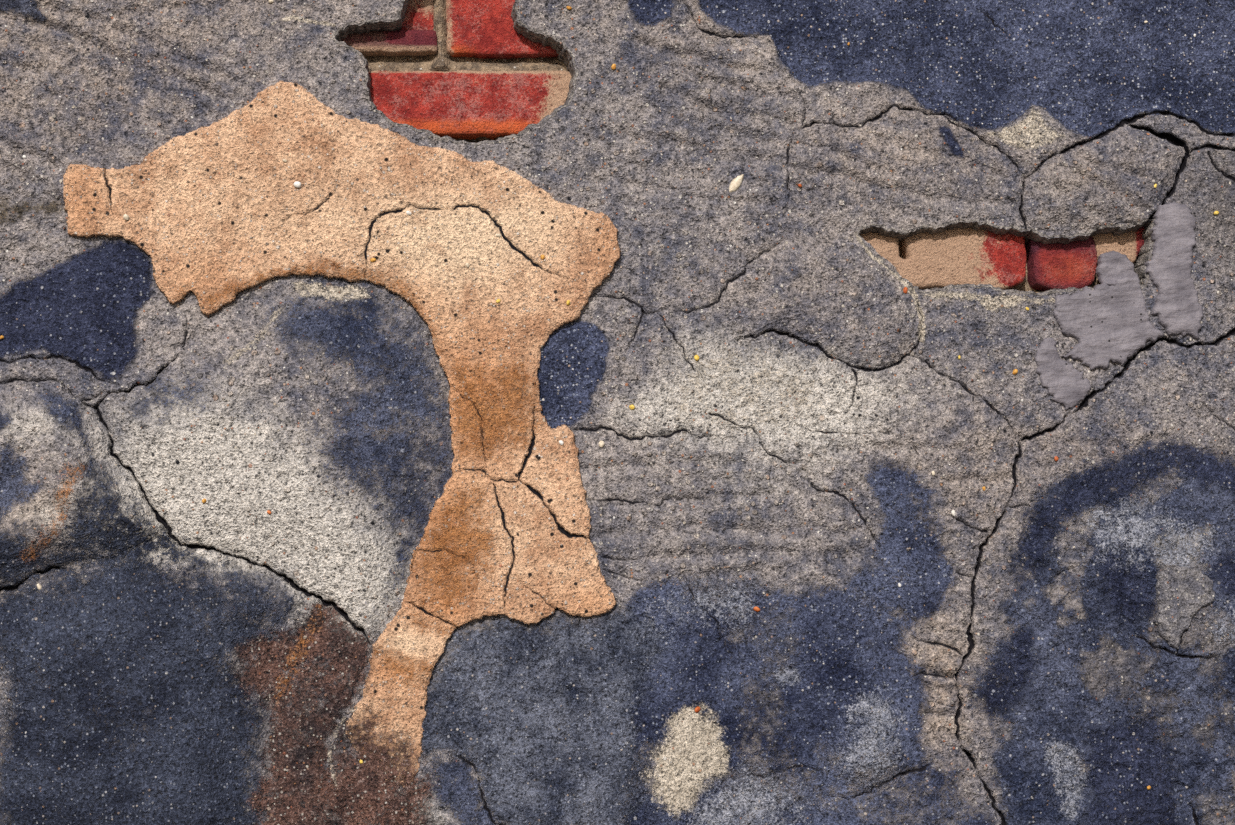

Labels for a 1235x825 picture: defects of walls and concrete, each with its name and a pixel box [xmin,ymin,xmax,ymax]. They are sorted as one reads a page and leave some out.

leakage [0,238,152,382]
spalling [332,0,578,146]
leakage [699,0,1235,157]
spalling [856,218,1156,296]
crack [786,98,1235,234]
leakage [0,394,305,825]
crack [0,325,369,696]
rust [232,600,438,825]
peeling [346,599,456,786]
peeling [493,403,616,625]
leakage [422,439,1235,825]
crack [737,302,1235,825]